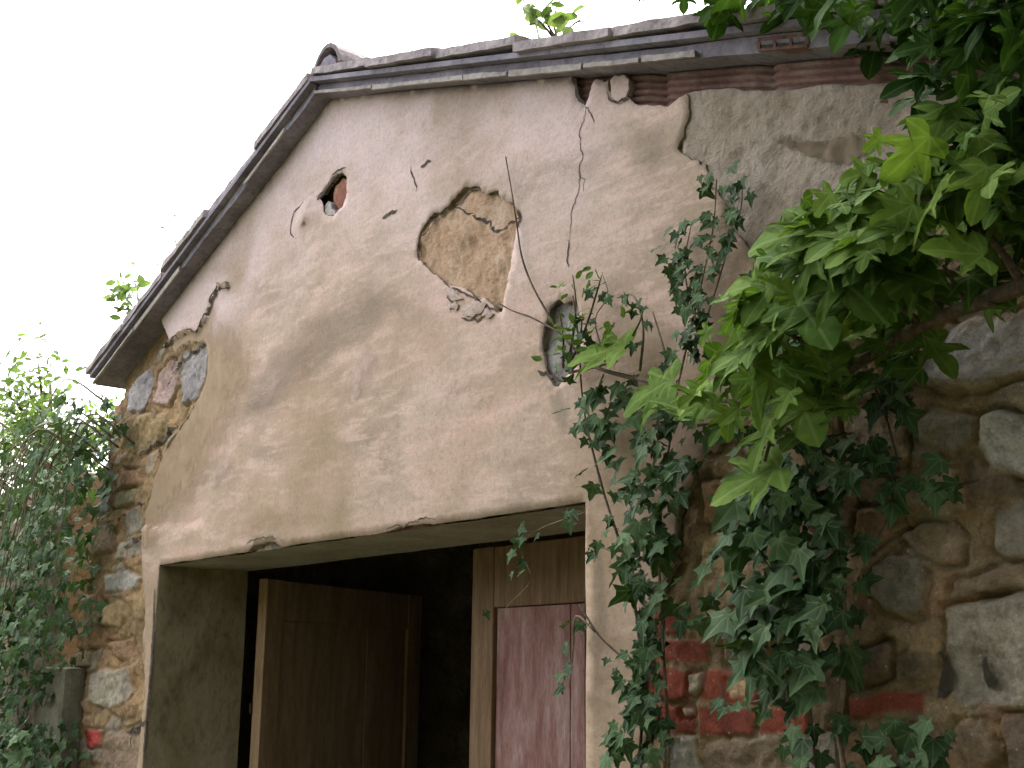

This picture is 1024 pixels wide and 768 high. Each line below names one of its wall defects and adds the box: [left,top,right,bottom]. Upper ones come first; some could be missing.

spalling [573,75,635,105]
crack [410,160,431,192]
crack [566,106,594,267]
spalling [679,75,958,256]
spalling [419,187,522,322]
spalling [542,299,583,387]
peeling [141,281,247,548]
spalling [245,536,285,553]